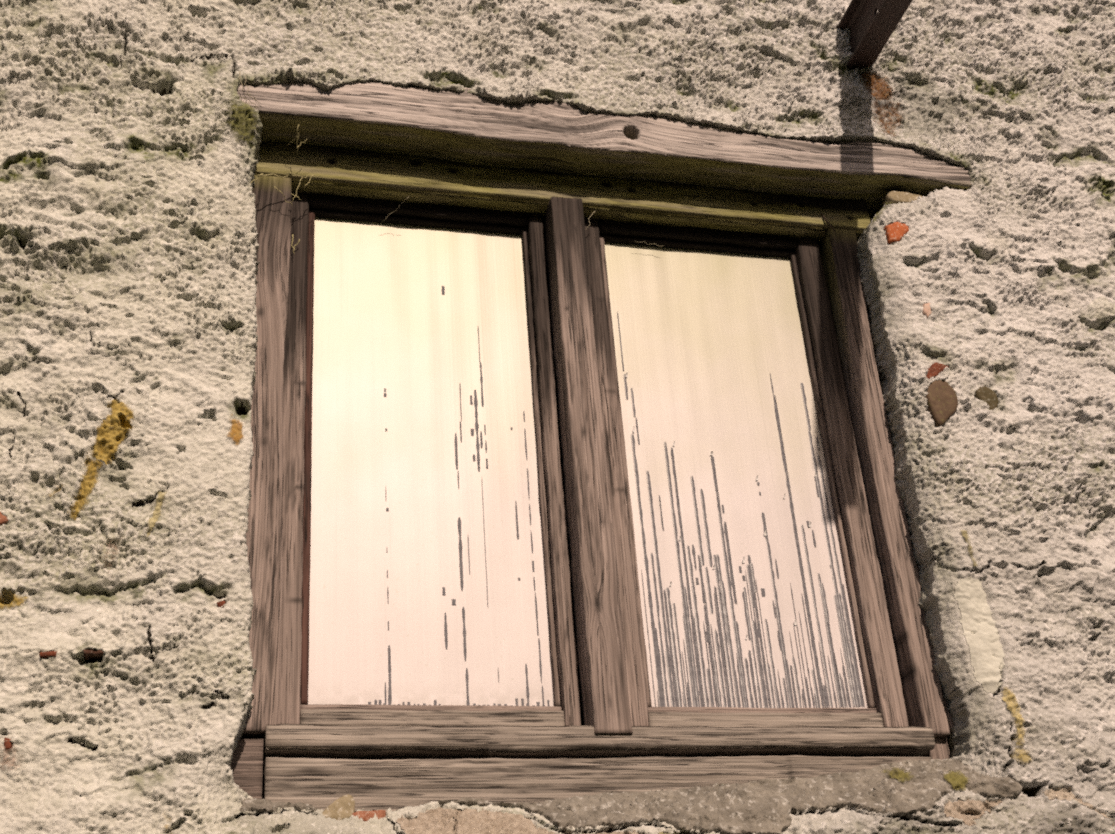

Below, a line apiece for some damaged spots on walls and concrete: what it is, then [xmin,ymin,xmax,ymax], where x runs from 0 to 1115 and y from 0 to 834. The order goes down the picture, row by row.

rust [861,72,902,136]
flaking render [396,805,645,834]
crack [530,818,705,834]
crack [782,806,953,832]